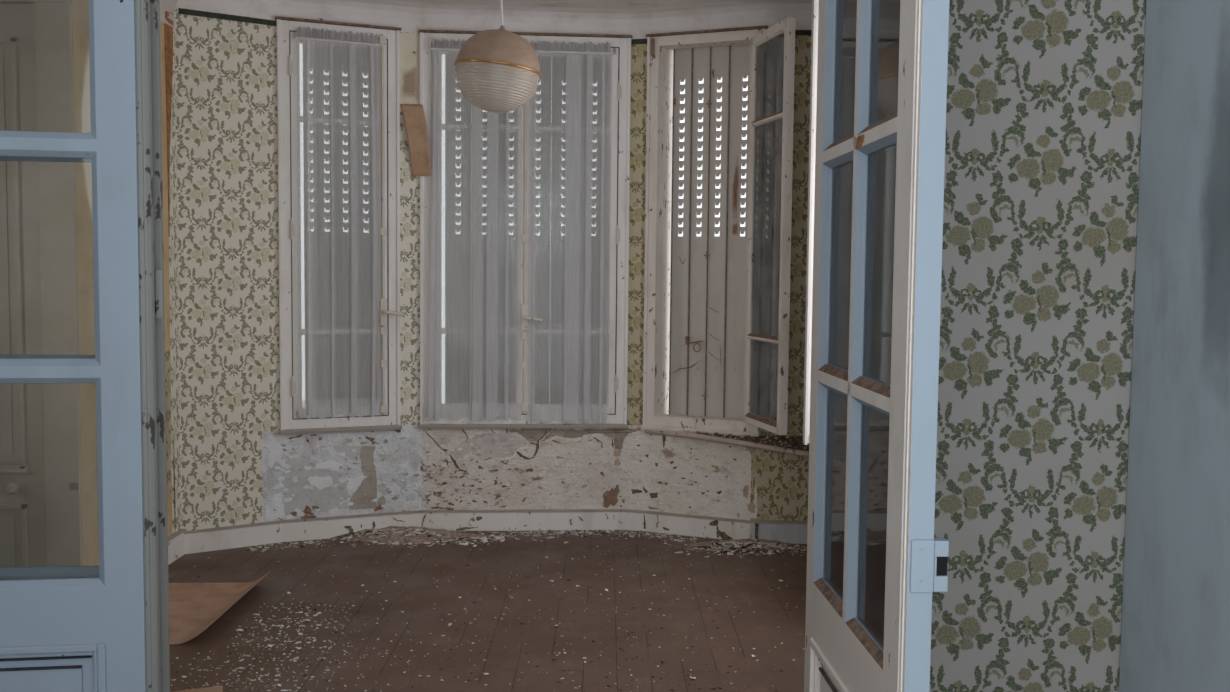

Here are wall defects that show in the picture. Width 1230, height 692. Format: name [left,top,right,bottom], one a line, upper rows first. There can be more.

peeling [264,427,757,529]